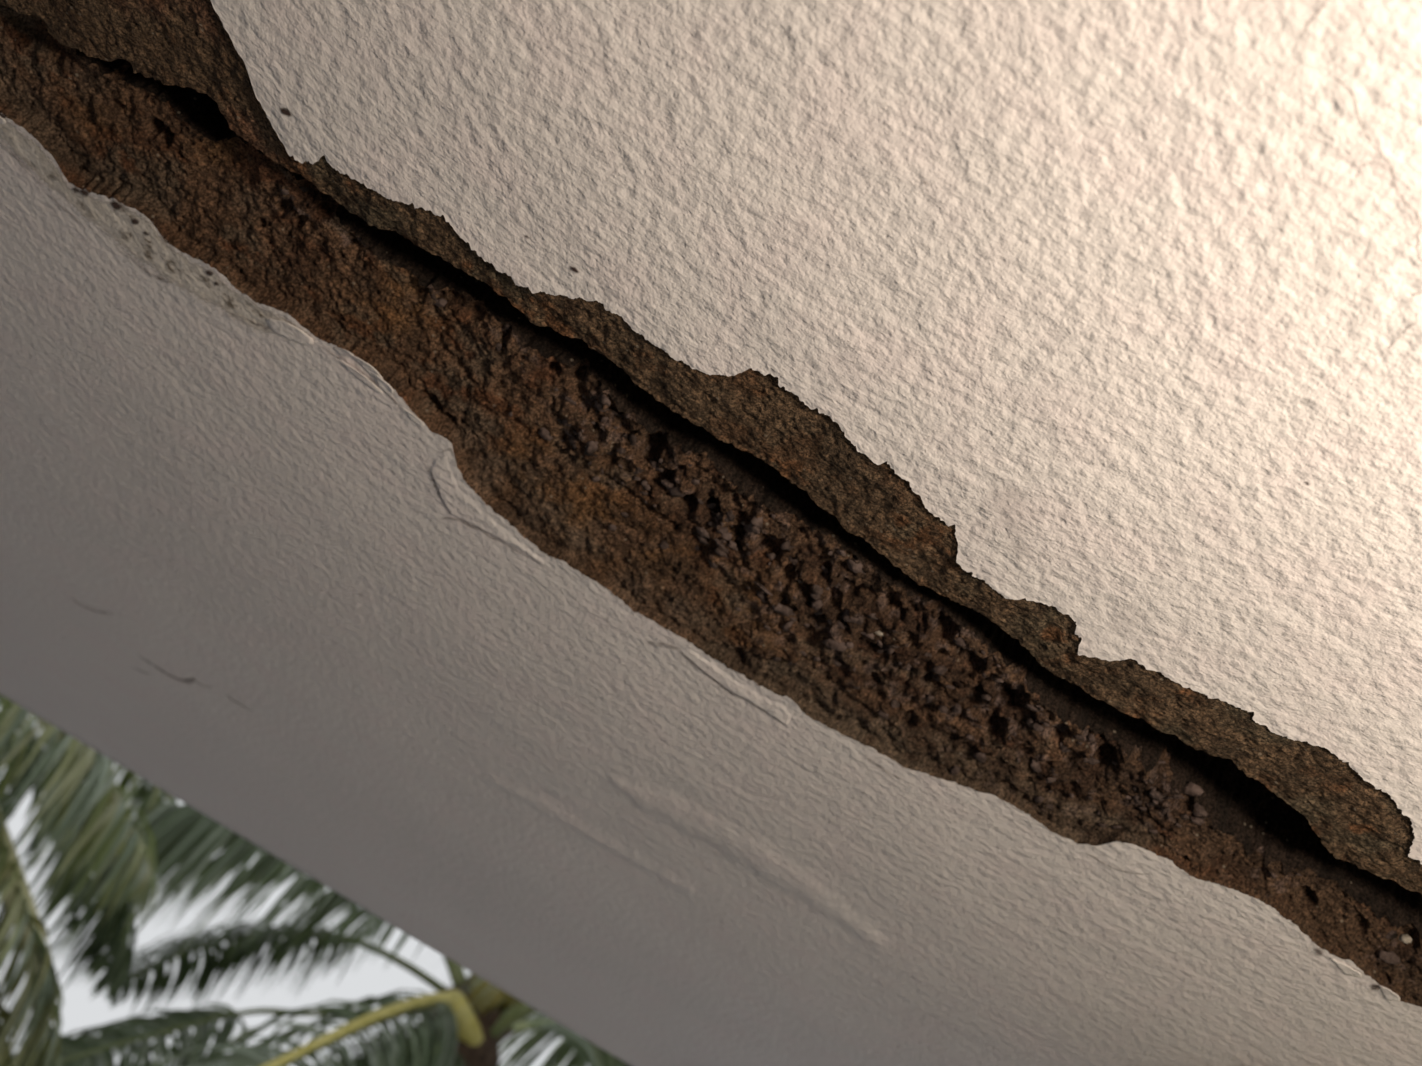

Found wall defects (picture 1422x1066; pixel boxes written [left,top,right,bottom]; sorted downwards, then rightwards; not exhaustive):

crack [1337,80,1421,259]
spalling [594,393,611,412]
spalling [660,477,686,497]
spalling [741,516,763,537]
spalling [713,527,739,559]
spalling [846,559,866,574]
spalling [810,584,823,616]
spalling [837,608,863,629]
spalling [931,666,948,681]
spalling [1149,786,1185,806]
spalling [1182,782,1204,796]
spalling [1180,802,1208,825]